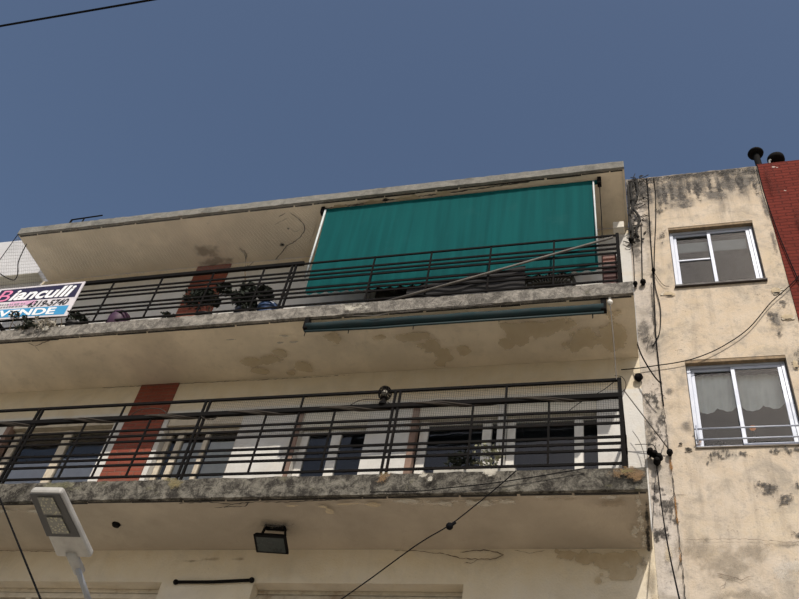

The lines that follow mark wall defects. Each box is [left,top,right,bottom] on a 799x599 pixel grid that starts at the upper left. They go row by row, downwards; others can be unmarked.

crack [275,213,316,260]
water stain [629,167,769,244]
water stain [638,295,657,351]
water stain [644,384,672,448]
peeling [394,499,515,507]
peeling [555,497,646,584]
water stain [645,482,680,551]
water stain [754,481,799,506]